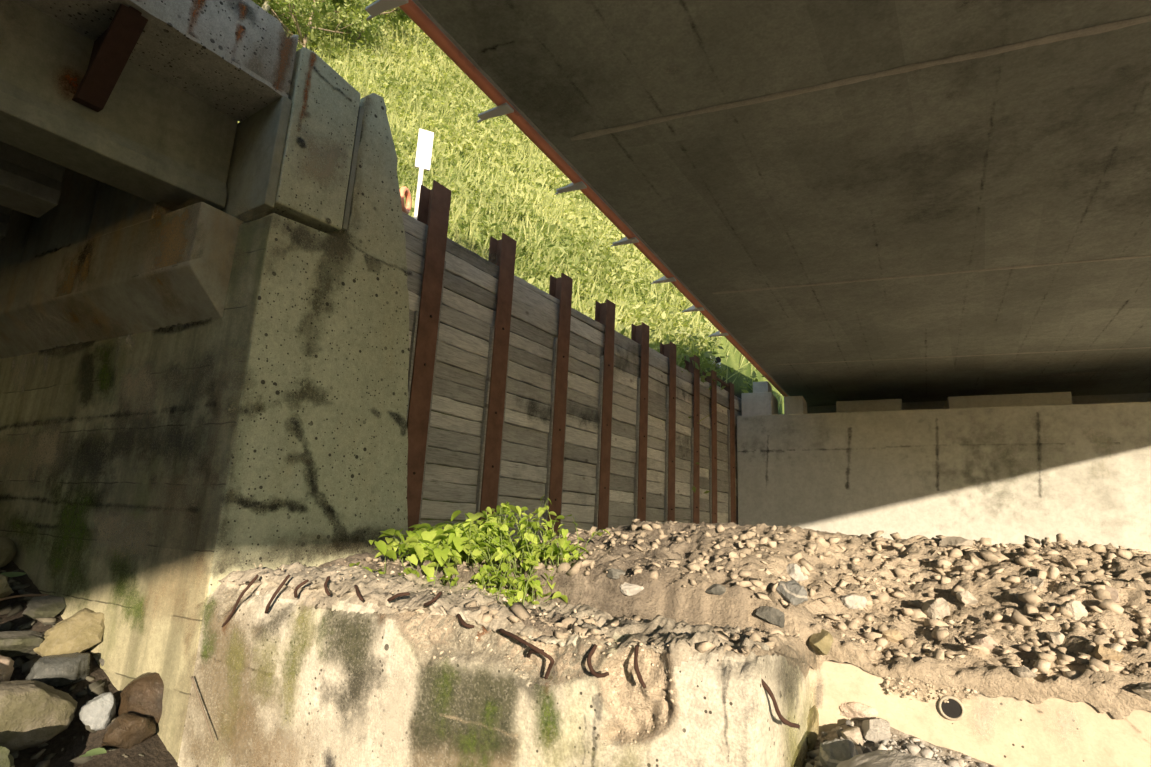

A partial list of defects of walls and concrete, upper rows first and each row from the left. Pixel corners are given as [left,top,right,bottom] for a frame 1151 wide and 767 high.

corrosion [236,5,246,44]
leakage [236,206,351,356]
leakage [0,337,213,622]
leakage [187,602,517,767]
spalling [219,563,679,745]